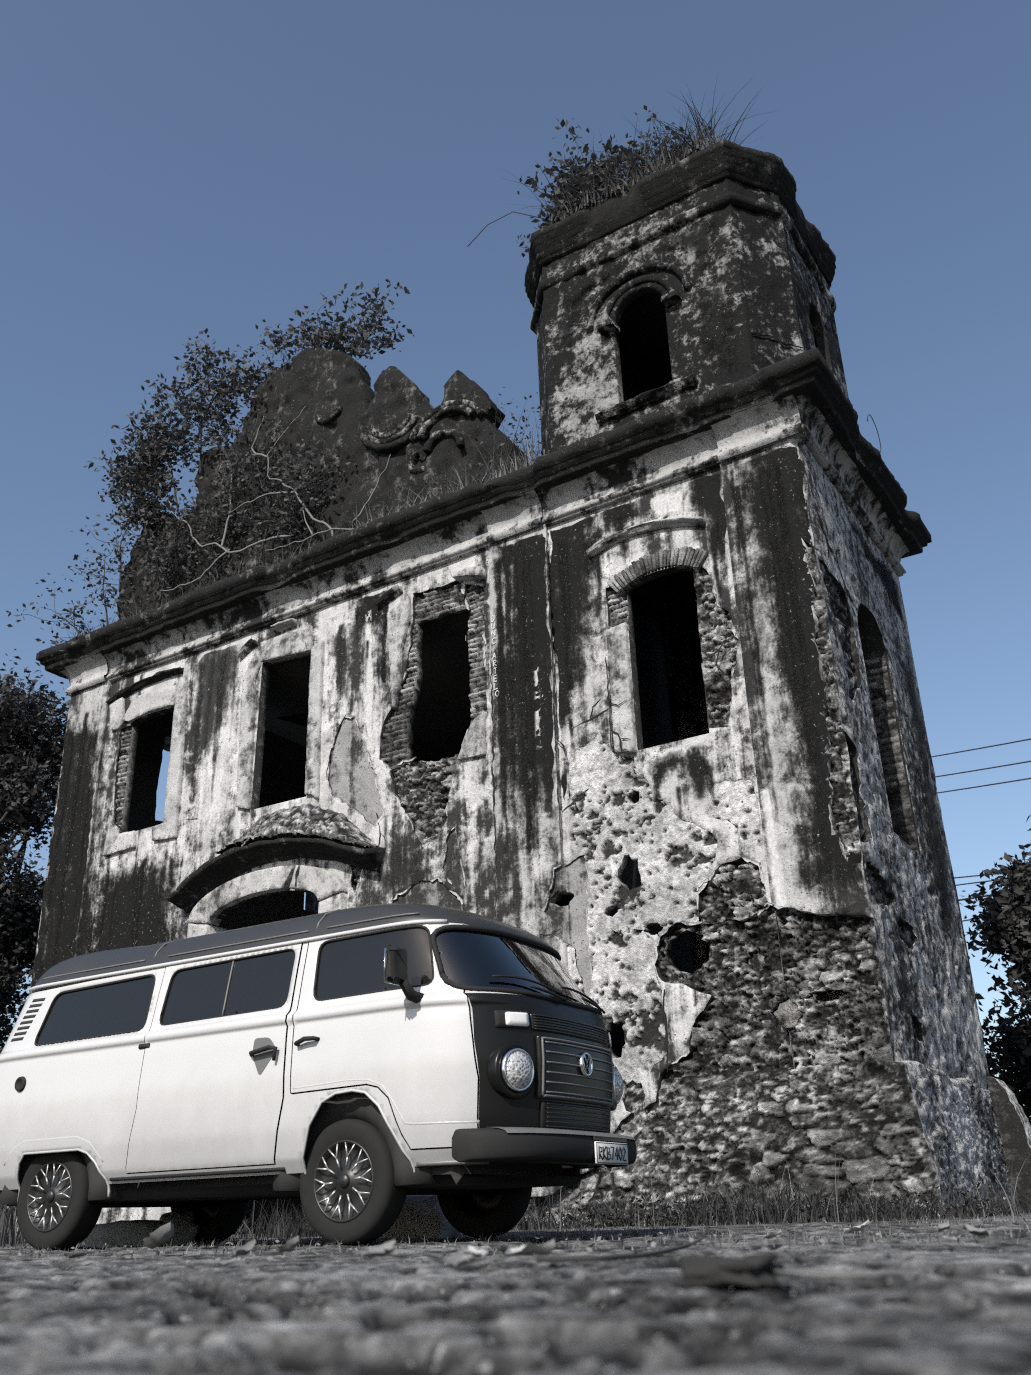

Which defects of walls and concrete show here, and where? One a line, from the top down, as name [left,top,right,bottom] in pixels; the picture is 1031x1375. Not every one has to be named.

damp [661,216,714,270]
damp [31,712,174,987]
damp [191,646,239,842]
flaking render [216,581,488,910]
flaking render [605,580,634,634]
damp [494,446,861,907]
flaking render [693,567,739,728]
flaking render [543,732,893,1138]
flaking render [806,543,865,857]
flaking render [557,1165,611,1214]